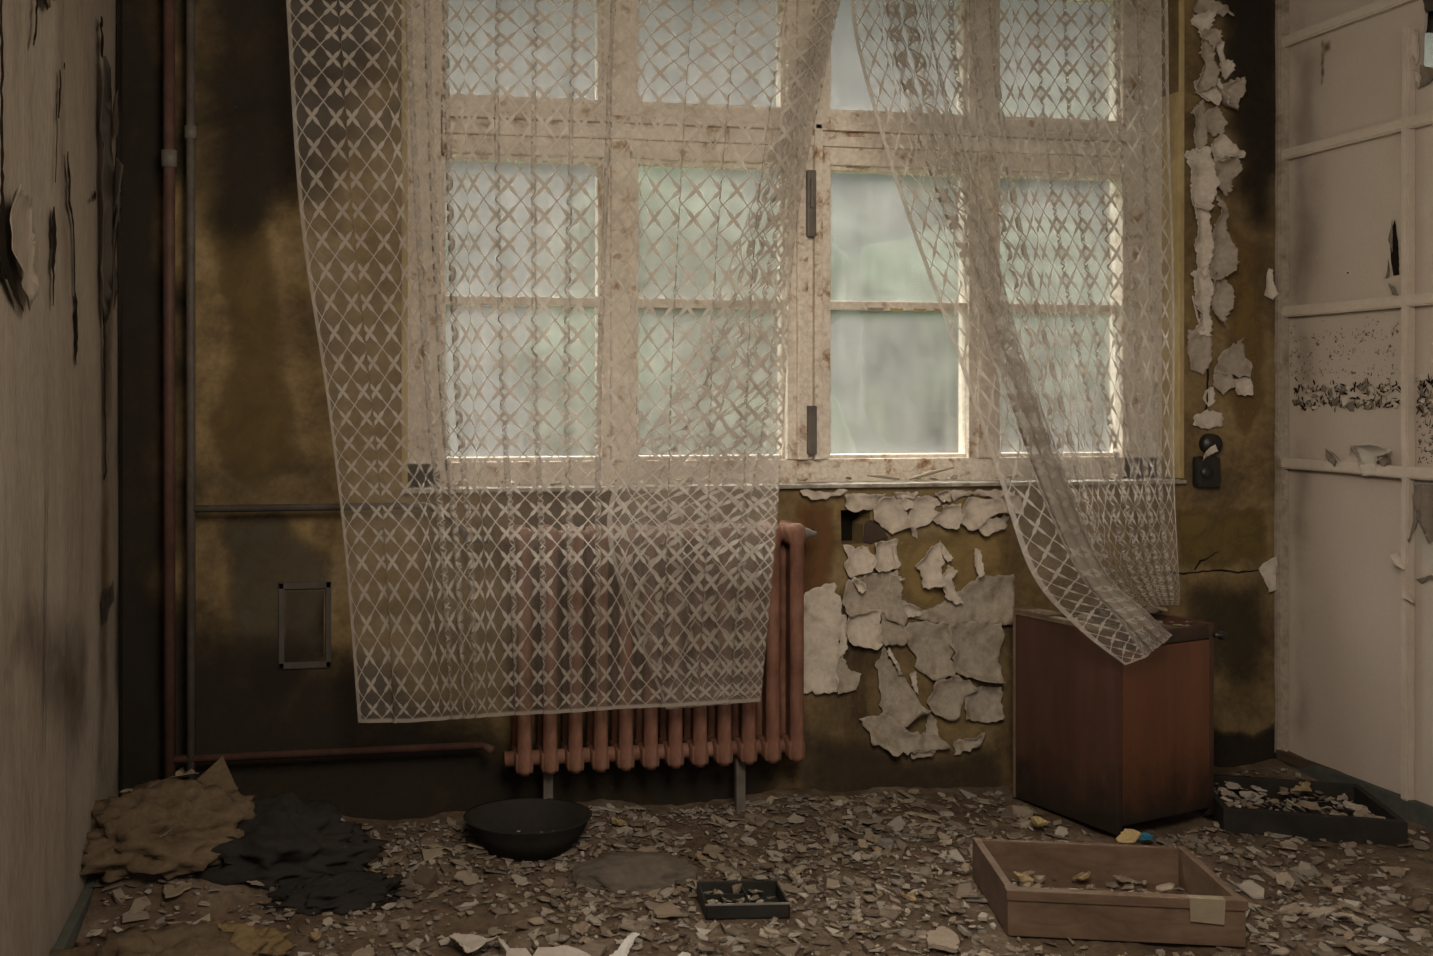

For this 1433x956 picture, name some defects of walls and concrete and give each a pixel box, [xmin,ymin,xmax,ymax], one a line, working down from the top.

hole [1423,0,1433,12]
hole [1411,30,1433,90]
peeling [1184,0,1254,429]
water stain [1176,511,1264,566]
peeling [800,489,1024,759]
water stain [1192,587,1263,677]
water stain [1214,727,1277,767]